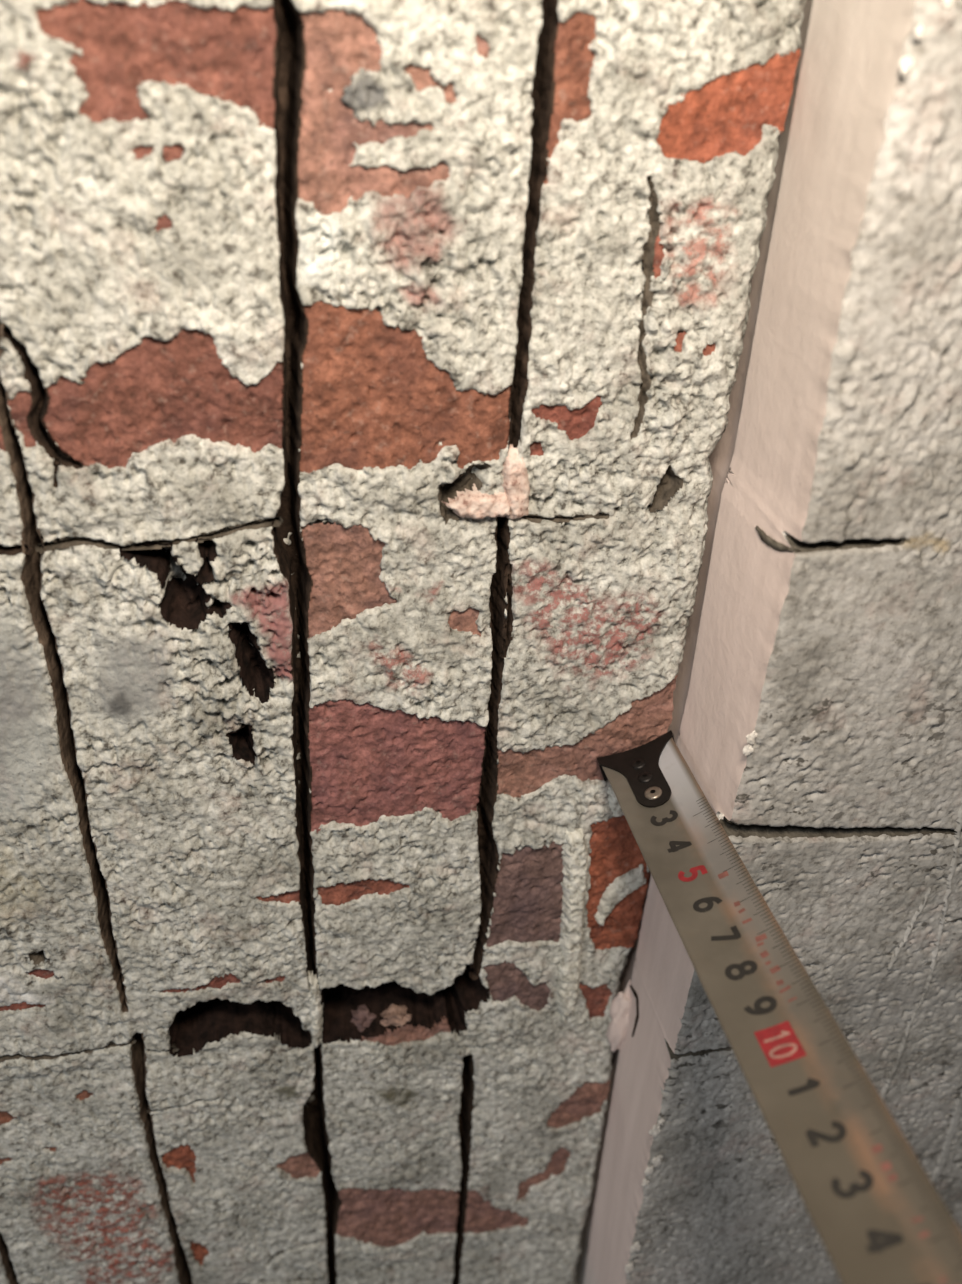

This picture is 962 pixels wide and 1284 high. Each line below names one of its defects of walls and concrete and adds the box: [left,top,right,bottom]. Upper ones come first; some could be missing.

spalling [36,0,277,130]
crack [2,324,83,488]
spalling [0,329,284,469]
spalling [299,300,511,525]
crack [0,515,283,556]
crack [520,512,609,524]
crack [755,526,906,553]
hole [117,538,276,704]
spalling [308,675,678,833]
crack [719,816,962,839]
crack [0,1036,179,1062]
spalling [154,961,551,1057]